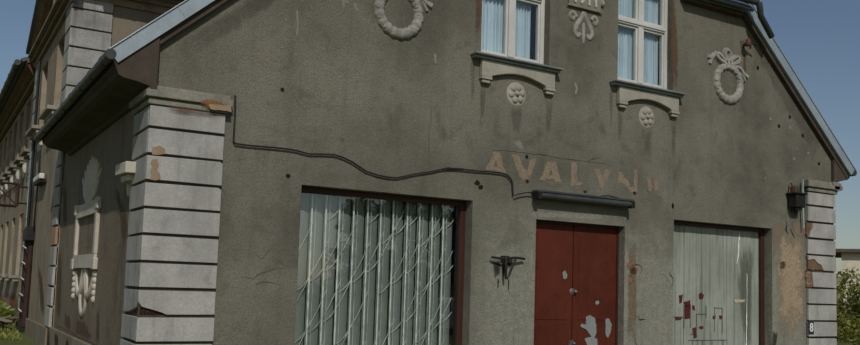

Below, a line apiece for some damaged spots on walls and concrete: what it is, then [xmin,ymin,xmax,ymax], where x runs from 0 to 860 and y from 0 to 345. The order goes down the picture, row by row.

spalling [150,146,165,180]
spalling [805,256,822,287]